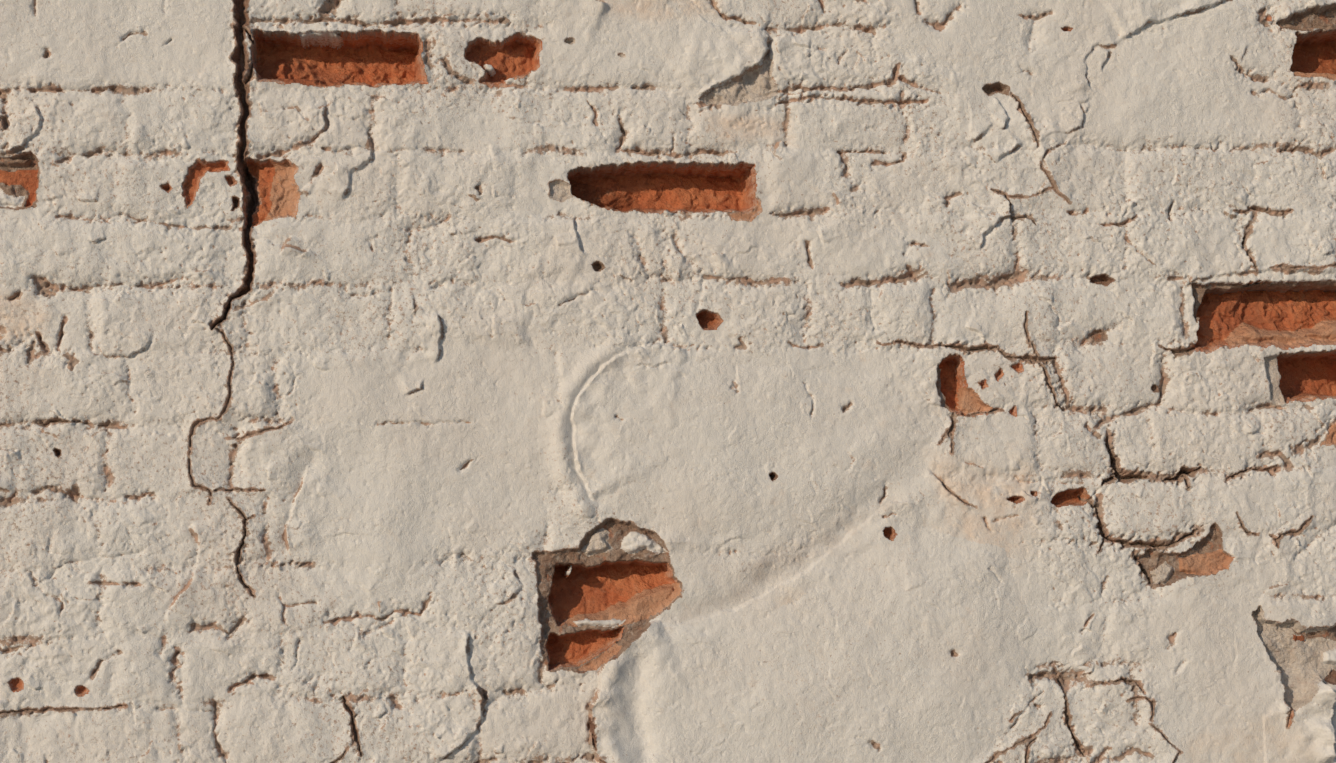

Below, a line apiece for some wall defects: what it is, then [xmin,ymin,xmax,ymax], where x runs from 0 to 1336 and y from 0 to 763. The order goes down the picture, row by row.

spalling [252,30,428,143]
spalling [464,33,543,88]
spalling [1265,0,1336,81]
crack [995,95,1070,224]
spalling [550,162,762,272]
crack [189,0,290,597]
crack [896,312,1057,403]
spalling [1187,280,1336,406]
crack [939,409,1003,508]
crack [1078,438,1278,584]
spalling [533,519,682,763]
crack [988,679,1179,763]